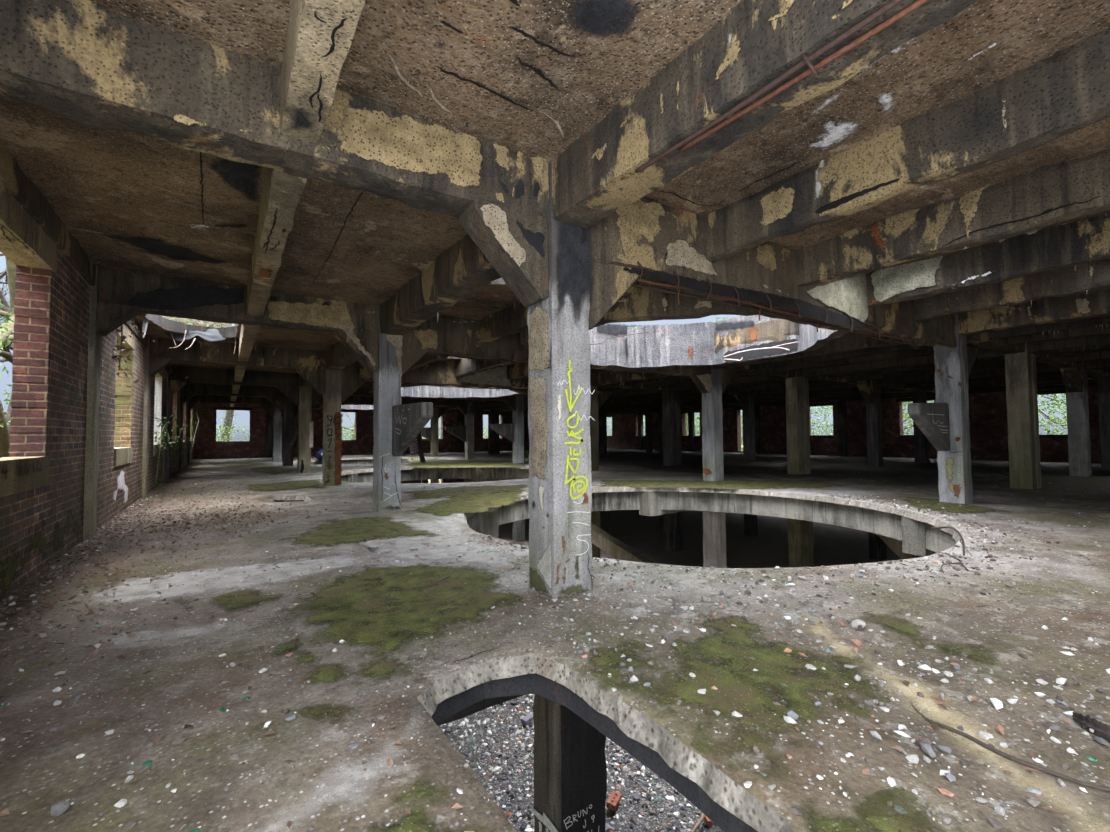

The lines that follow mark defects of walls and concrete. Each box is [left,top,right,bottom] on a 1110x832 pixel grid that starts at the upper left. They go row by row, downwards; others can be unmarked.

crack [309,12,348,123]
crack [440,21,464,34]
crack [435,66,533,111]
crack [509,0,576,90]
leakage [571,0,636,36]
peeling [715,33,741,80]
peeling [173,114,216,126]
peeling [322,107,544,187]
peeling [480,187,526,267]
peeling [760,186,795,226]
spalling [815,177,905,214]
spalling [616,199,866,328]